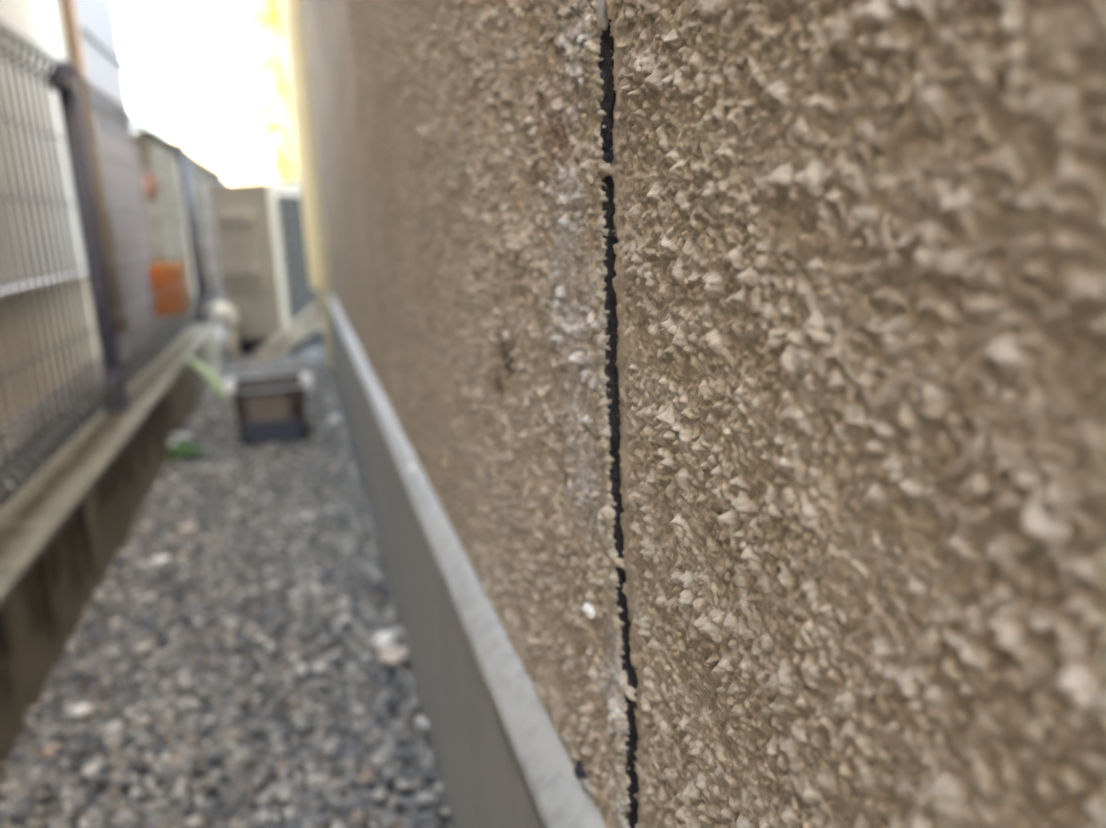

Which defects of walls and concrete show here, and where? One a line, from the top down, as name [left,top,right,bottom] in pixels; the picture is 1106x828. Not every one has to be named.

crack [591,0,639,828]